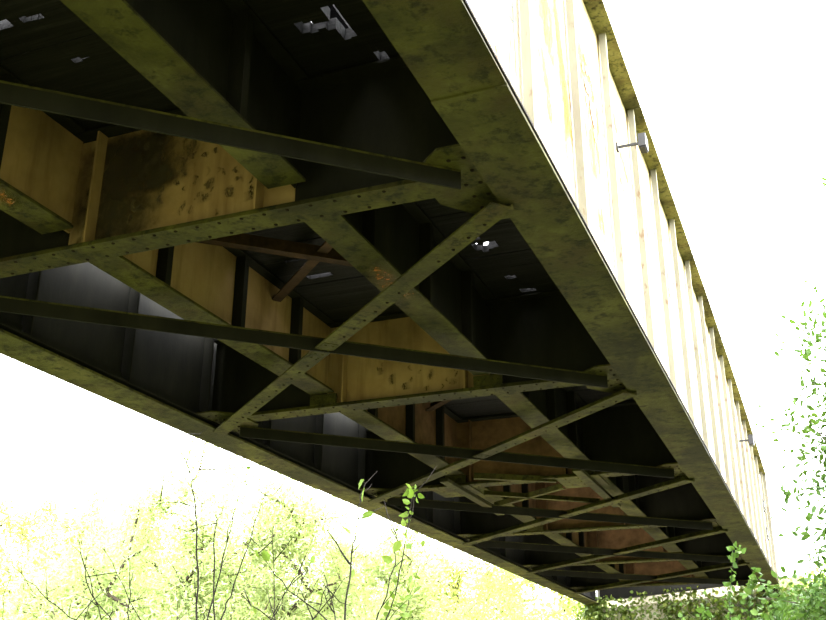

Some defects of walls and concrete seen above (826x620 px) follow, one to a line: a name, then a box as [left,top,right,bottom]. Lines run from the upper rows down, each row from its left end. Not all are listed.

rust [535,0,573,176]